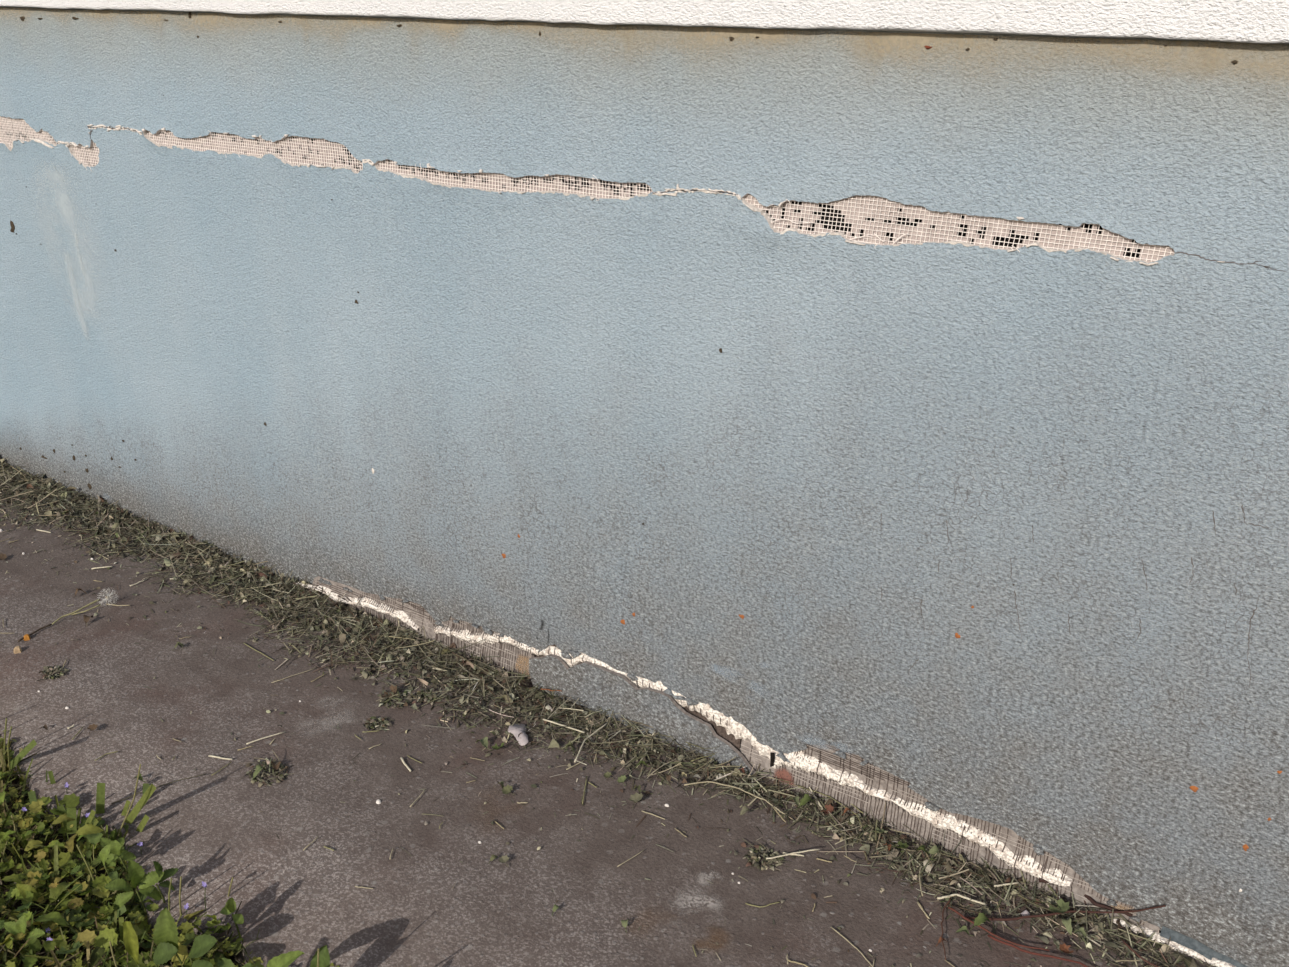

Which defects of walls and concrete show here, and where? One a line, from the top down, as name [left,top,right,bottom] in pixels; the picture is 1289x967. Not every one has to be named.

peeling [0,116,99,170]
peeling [142,128,653,201]
peeling [742,194,1175,266]
crack [1175,252,1285,272]
flaking render [291,576,1248,967]